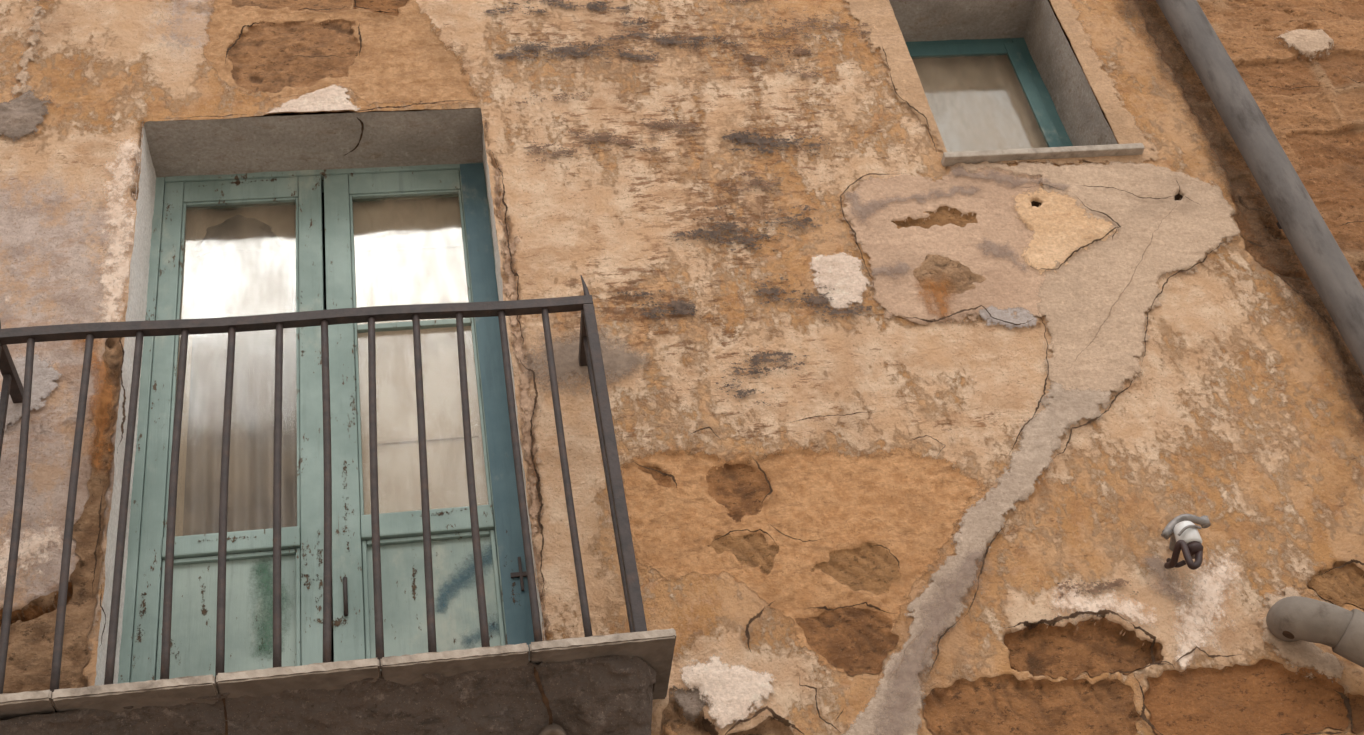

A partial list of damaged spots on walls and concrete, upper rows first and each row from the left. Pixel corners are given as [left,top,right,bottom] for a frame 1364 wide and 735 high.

flaking render [203,0,490,130]
flaking render [131,122,143,199]
flaking render [486,146,551,641]